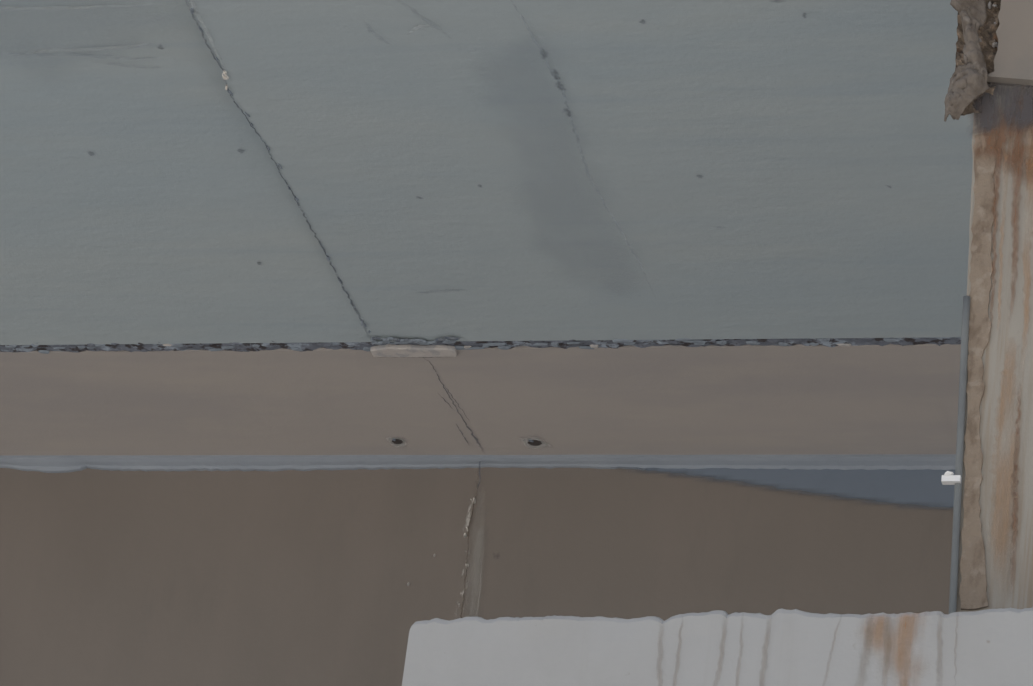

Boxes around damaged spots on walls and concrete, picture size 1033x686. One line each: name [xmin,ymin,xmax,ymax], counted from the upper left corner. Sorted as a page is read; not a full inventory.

crack [0,8,961,354]
peeling [944,0,1001,122]
crack [433,367,481,618]